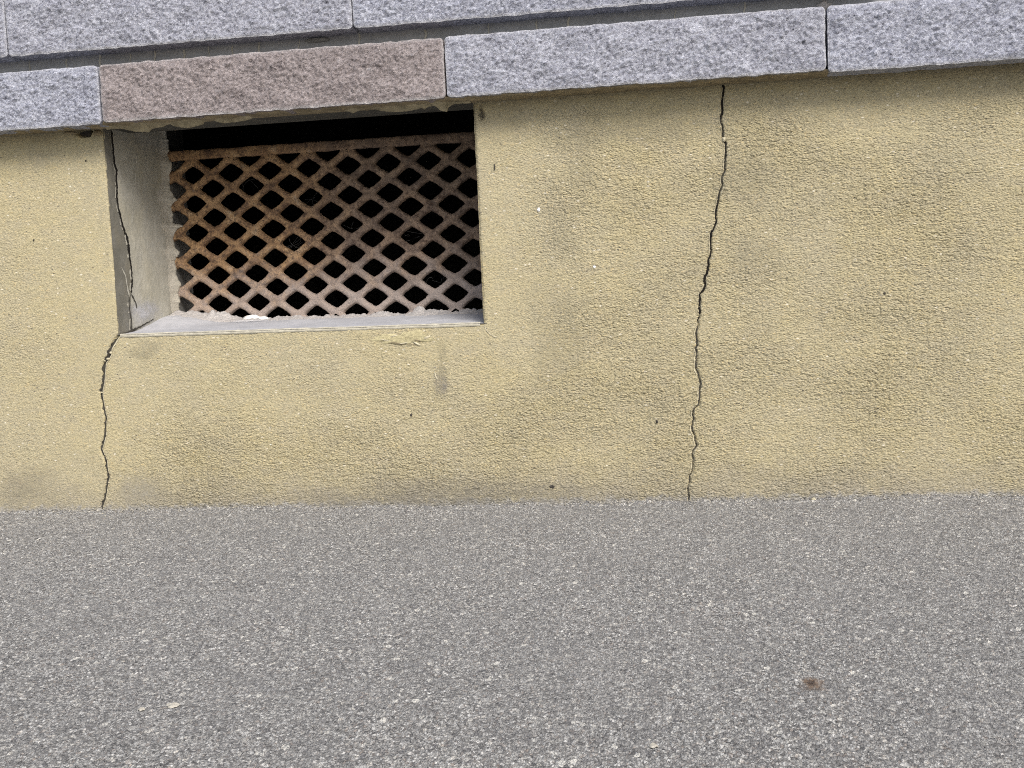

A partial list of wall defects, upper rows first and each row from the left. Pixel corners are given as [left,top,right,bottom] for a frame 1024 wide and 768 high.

crack [99,131,154,509]
crack [686,85,728,500]